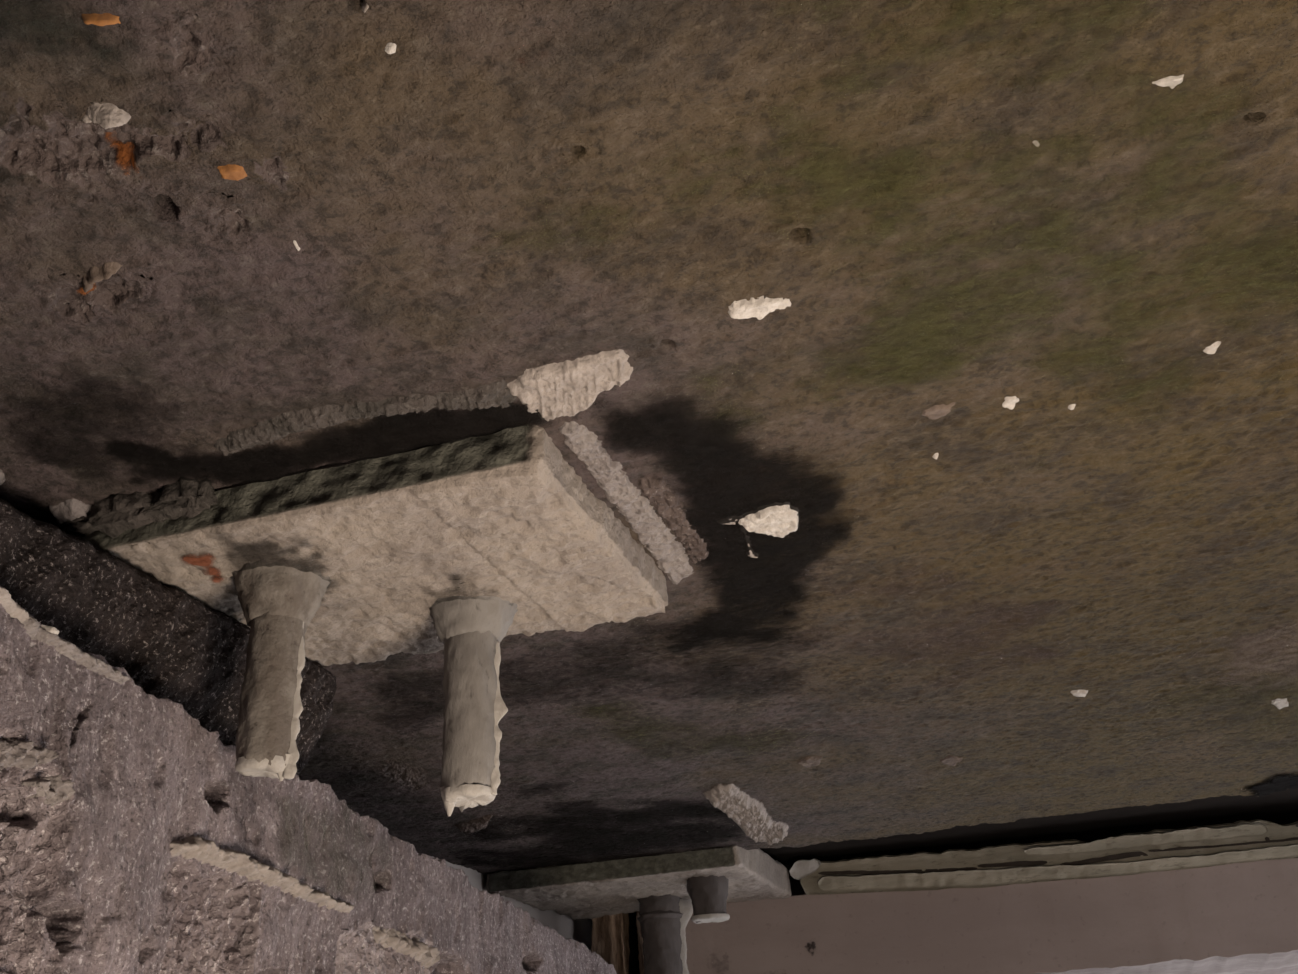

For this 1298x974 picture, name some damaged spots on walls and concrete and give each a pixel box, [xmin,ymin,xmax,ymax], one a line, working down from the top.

spalling [0,85,247,205]
spalling [33,260,156,327]